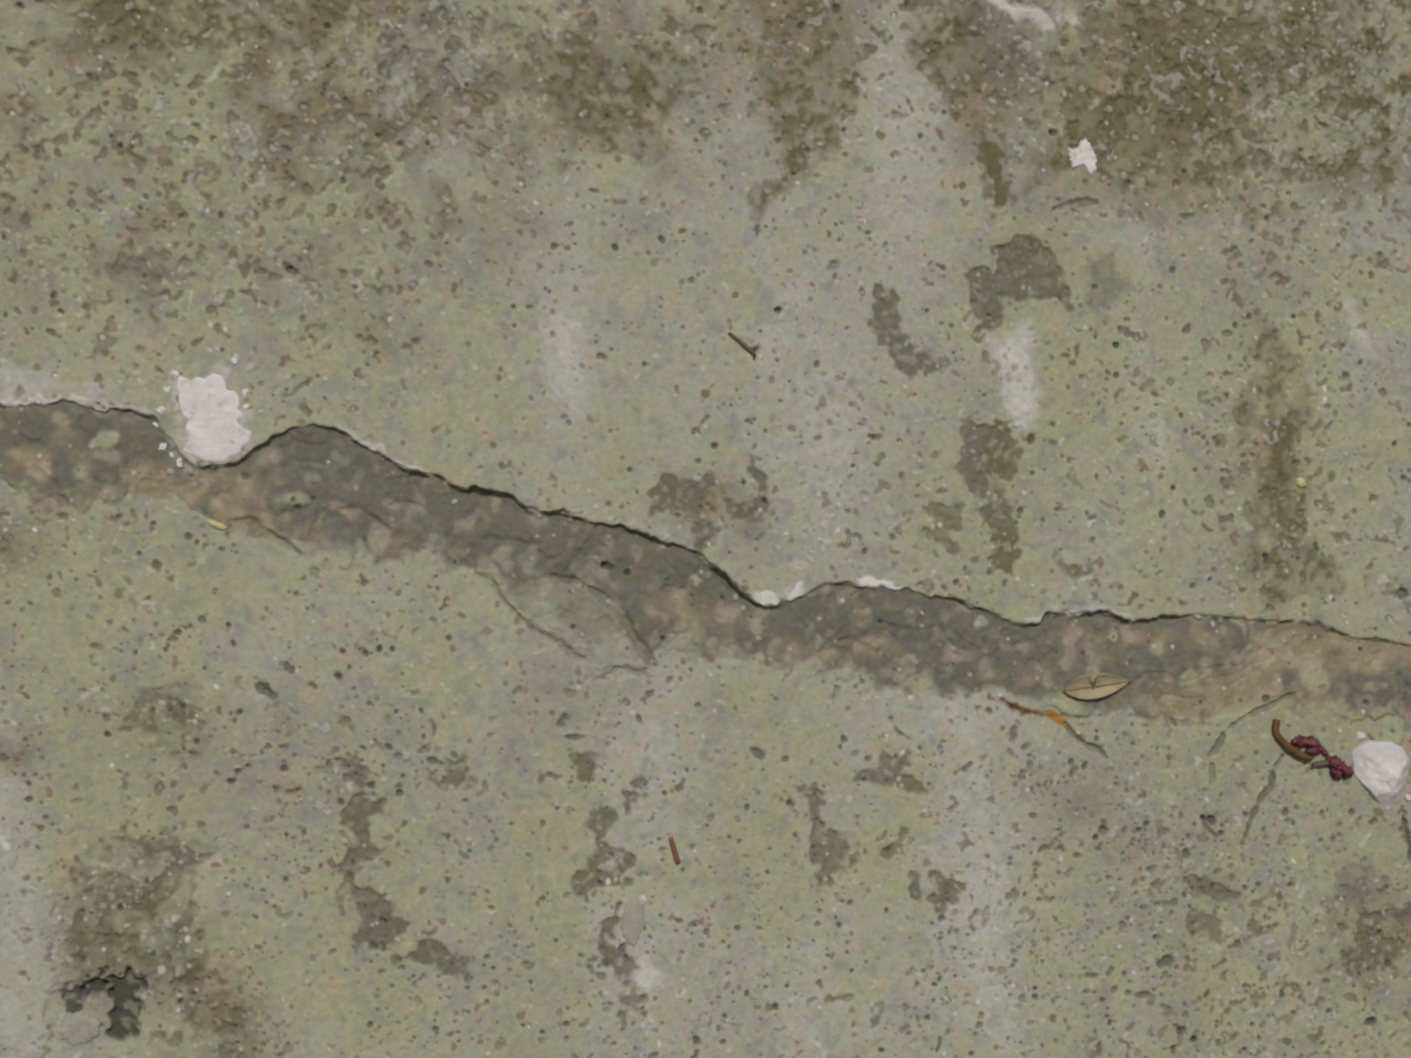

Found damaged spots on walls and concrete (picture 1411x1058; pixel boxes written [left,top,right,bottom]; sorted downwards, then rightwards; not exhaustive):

leakage [986,0,1078,31]
leakage [989,321,1041,430]
peeling [647,455,775,554]
peeling [922,417,1023,575]
peeling [1053,555,1093,579]
crack [0,392,1411,846]
spalling [124,677,203,767]